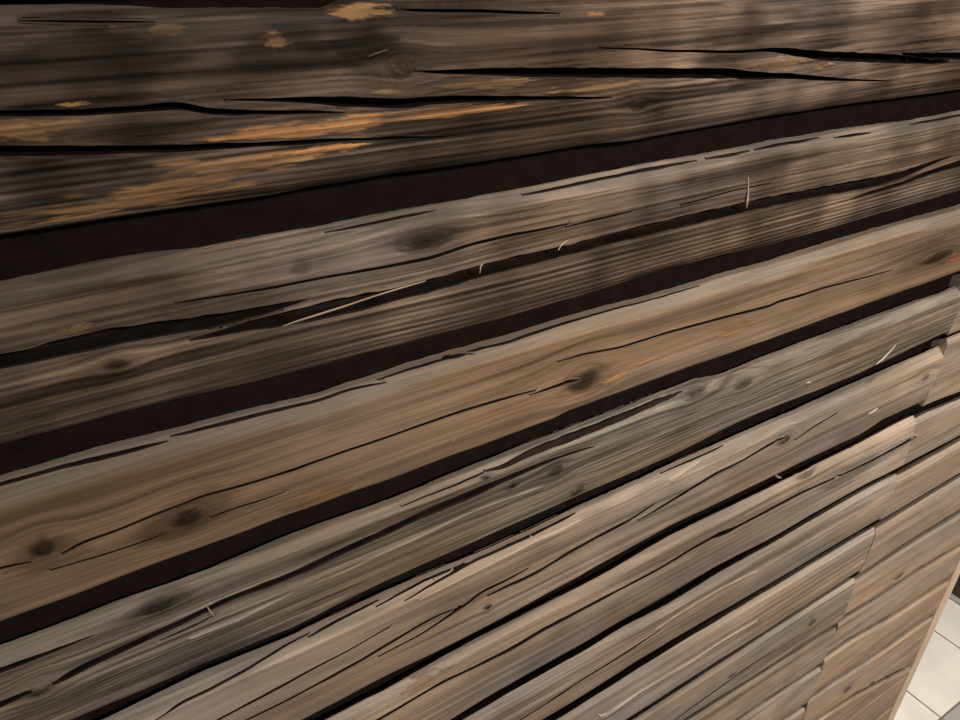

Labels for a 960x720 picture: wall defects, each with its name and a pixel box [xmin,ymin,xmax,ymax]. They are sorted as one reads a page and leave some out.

crack [0,45,960,160]
crack [0,154,960,372]
crack [521,130,872,198]
crack [0,268,893,572]
crack [0,389,917,720]